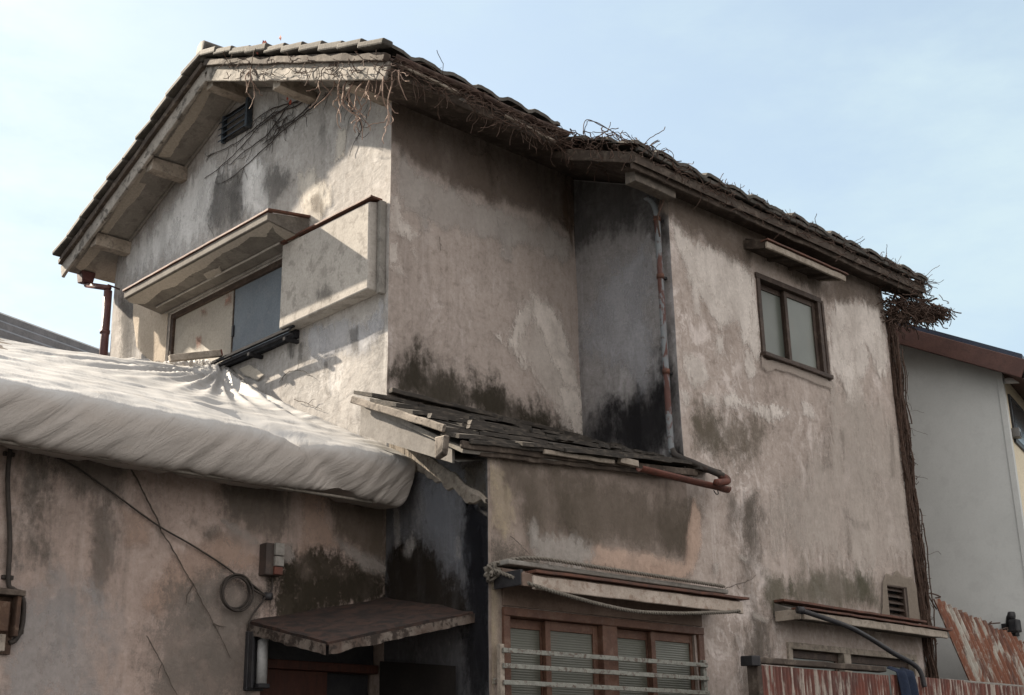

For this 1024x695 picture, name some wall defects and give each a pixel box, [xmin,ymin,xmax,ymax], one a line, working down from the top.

water stain [126,152,331,278]
water stain [388,246,790,452]
water stain [663,197,912,607]
water stain [266,460,702,695]